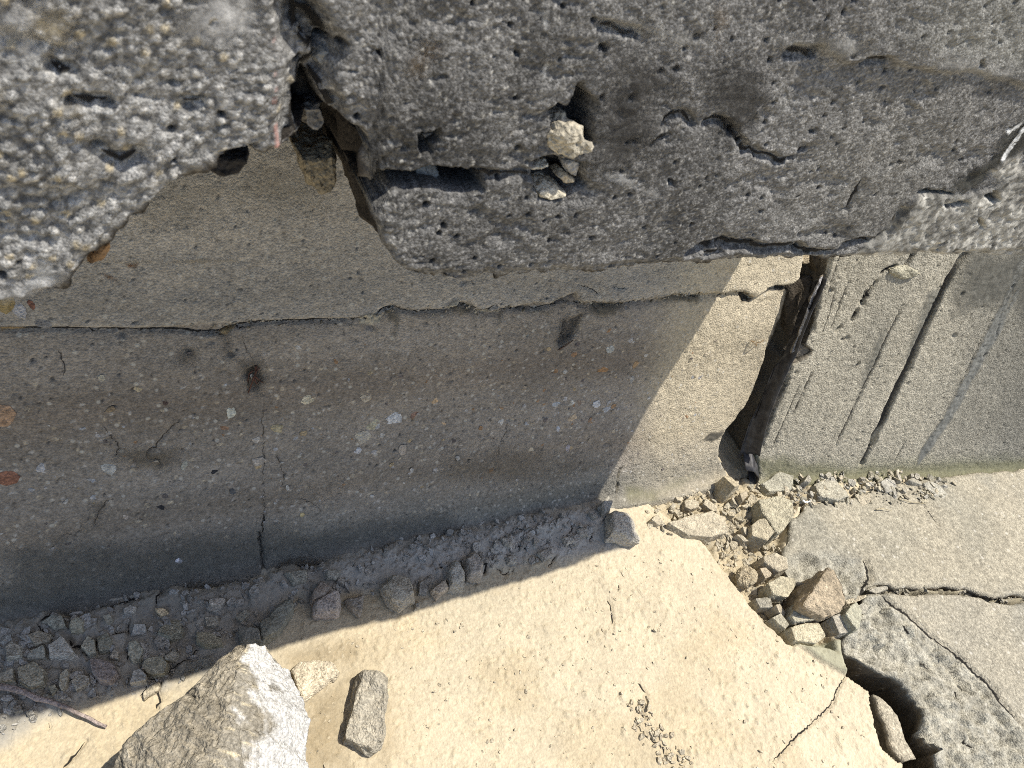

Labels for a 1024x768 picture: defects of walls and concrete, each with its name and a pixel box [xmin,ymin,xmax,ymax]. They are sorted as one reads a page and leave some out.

crack [652,110,802,163]
spalling [0,297,52,330]
crack [15,285,630,387]
spalling [0,471,20,486]
spalling [77,393,147,504]
spalling [192,383,241,446]
crack [257,412,284,566]
spalling [248,406,322,491]
spalling [333,371,474,484]
spalling [479,328,696,481]
crack [860,561,1019,724]